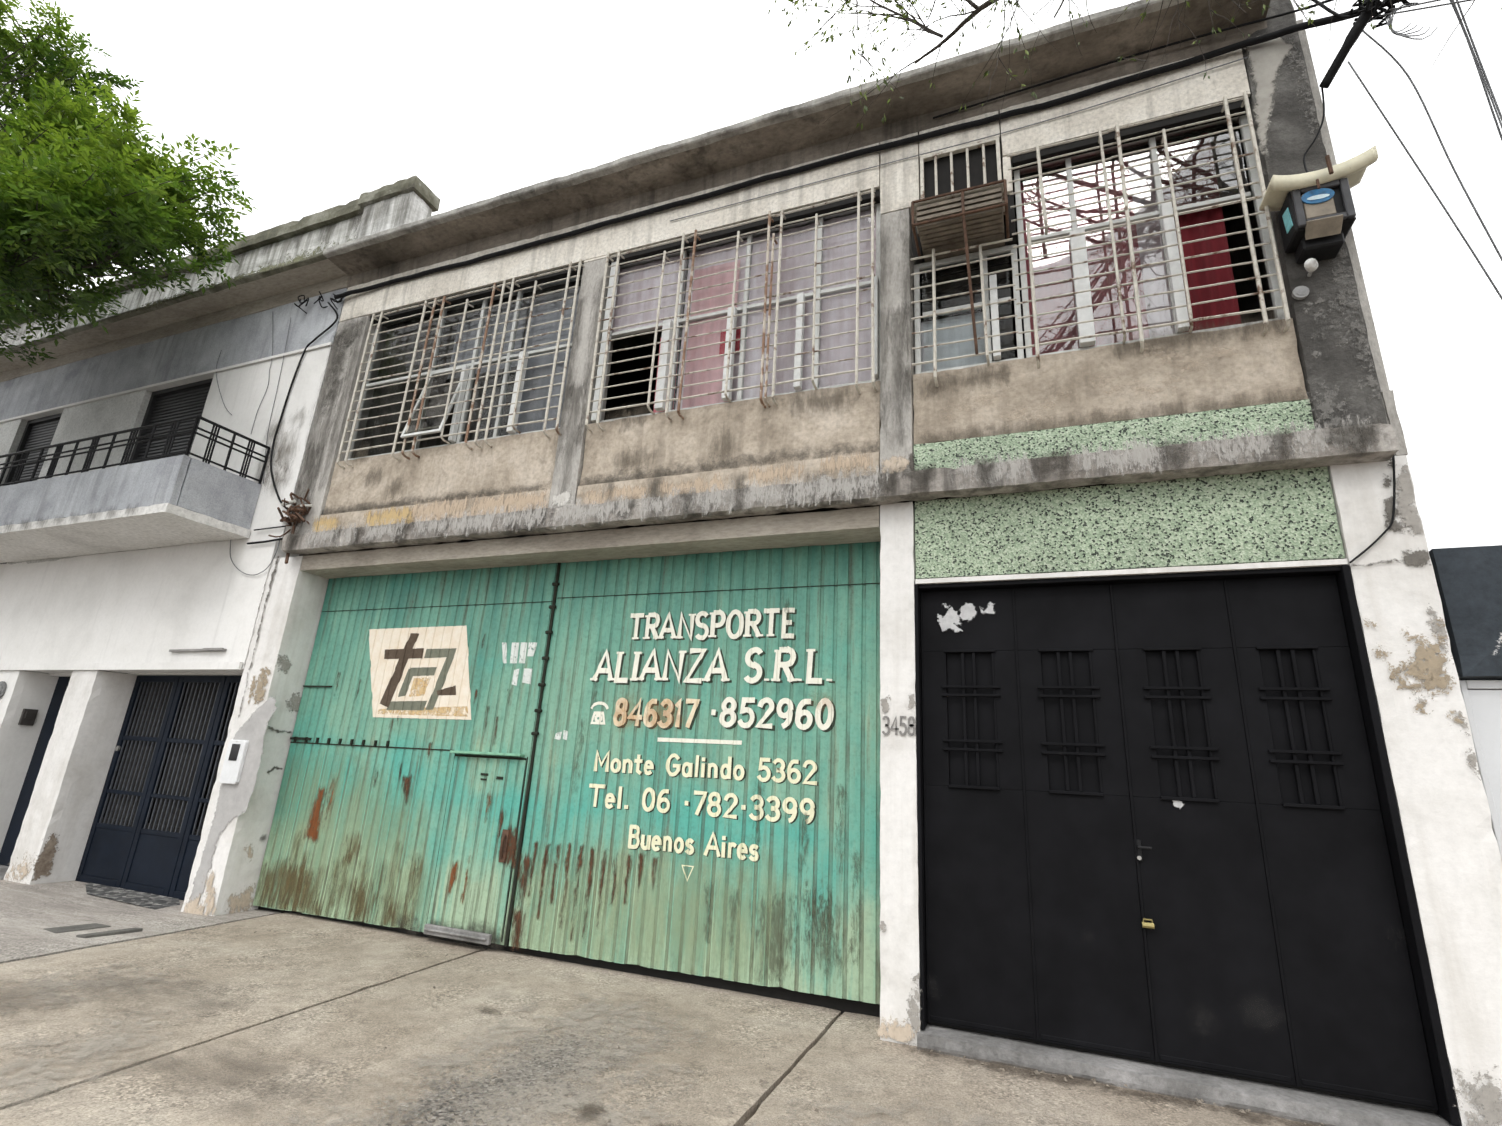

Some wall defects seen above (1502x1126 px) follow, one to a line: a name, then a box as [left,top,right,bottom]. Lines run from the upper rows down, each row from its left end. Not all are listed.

water stain [1117,329,1224,355]
water stain [1328,425,1377,448]
water stain [577,438,873,517]
water stain [874,463,935,497]
peeling [937,602,995,633]
peeling [248,655,292,704]
peeling [1371,606,1481,781]
rust [399,763,412,801]
peeling [183,871,256,916]
rust [256,779,422,927]
rust [448,862,468,903]
rust [485,793,658,949]